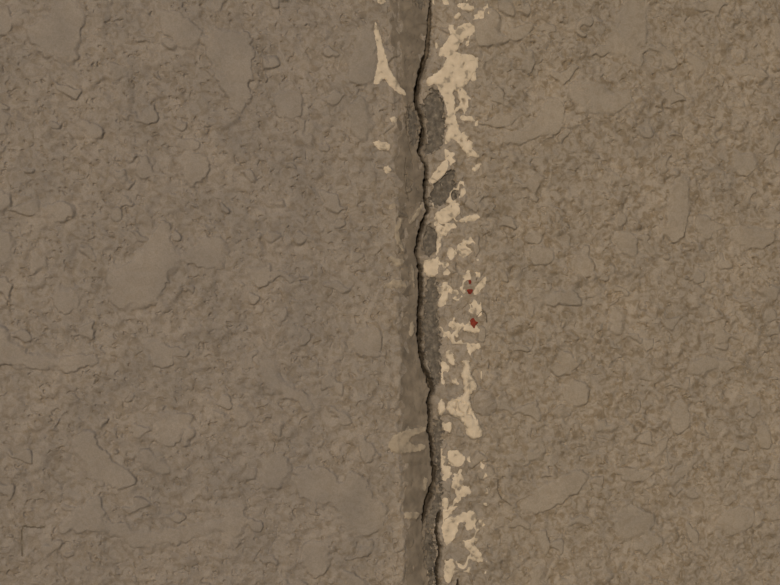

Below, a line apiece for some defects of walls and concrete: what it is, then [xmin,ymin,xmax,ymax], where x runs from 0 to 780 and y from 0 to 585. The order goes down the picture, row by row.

peeling [373,140,391,151]
peeling [374,22,406,95]
crack [404,0,458,585]
peeling [382,0,489,583]